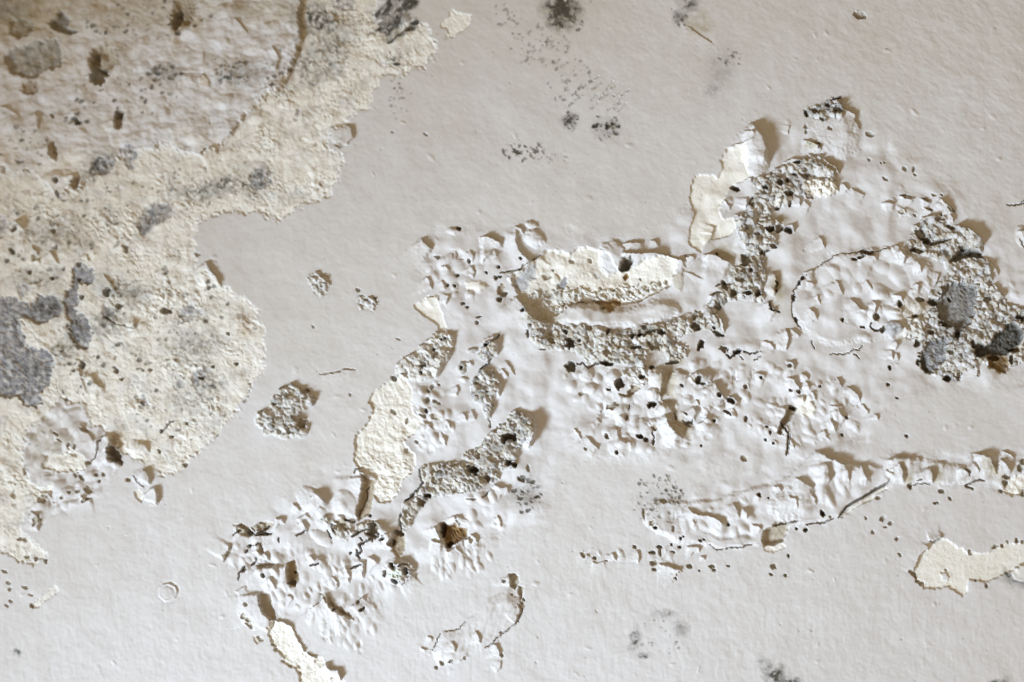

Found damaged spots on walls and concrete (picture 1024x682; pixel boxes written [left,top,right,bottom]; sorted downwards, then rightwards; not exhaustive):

leakage [502,142,569,164]
leakage [495,0,630,141]
spalling [806,96,857,122]
flaking render [0,0,437,567]
spalling [882,196,1024,383]
spalling [218,140,849,682]
peeling [895,535,1024,597]